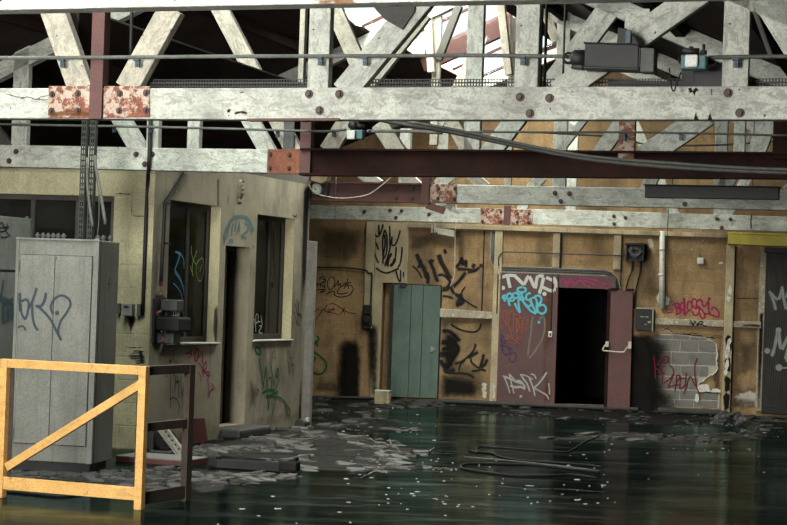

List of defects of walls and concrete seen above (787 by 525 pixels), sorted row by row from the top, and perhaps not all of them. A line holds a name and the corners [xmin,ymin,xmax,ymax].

flaking render [652,334,732,410]